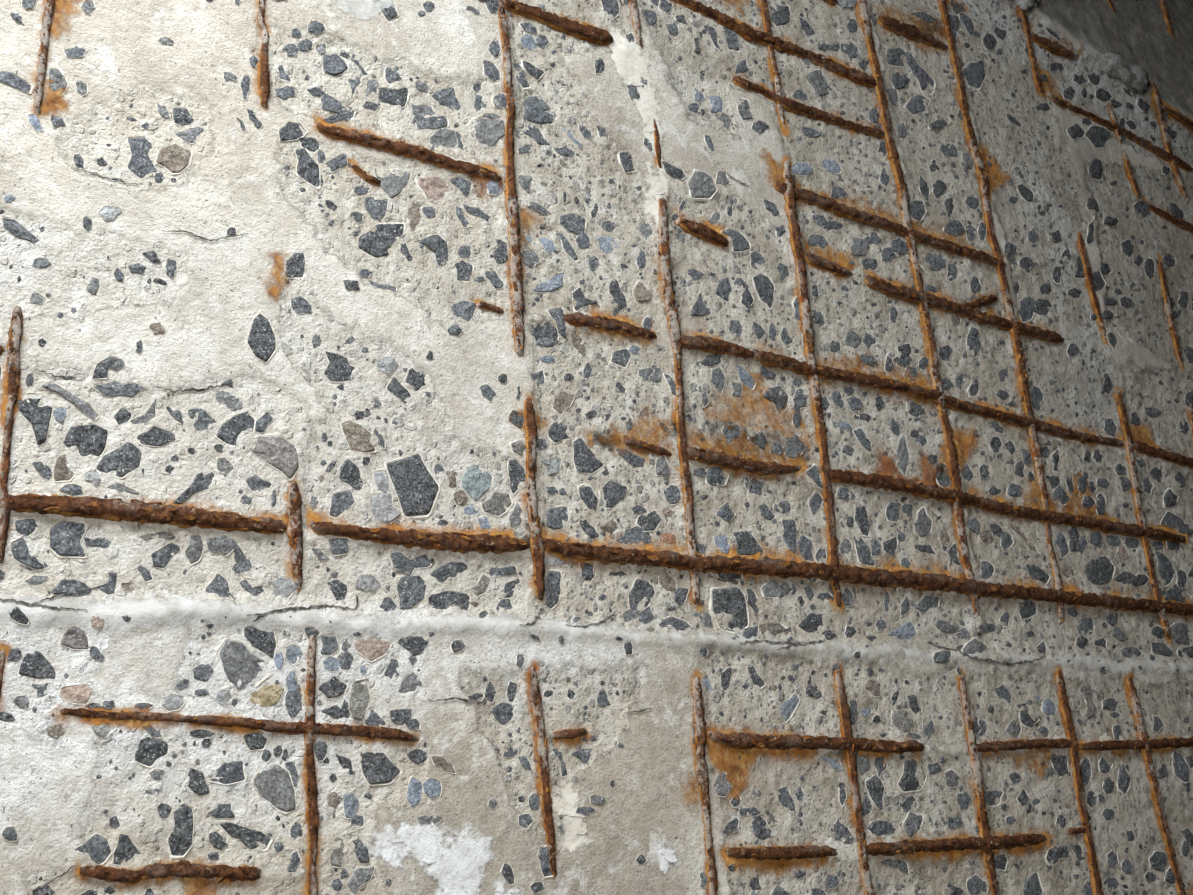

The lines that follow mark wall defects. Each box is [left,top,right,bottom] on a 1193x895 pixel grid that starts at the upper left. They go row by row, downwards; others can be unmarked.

corrosion [33,78,68,116]
spalling [342,280,360,291]
spalling [246,311,277,363]
corrosion [803,242,952,404]
spalling [479,373,508,402]
spalling [1050,440,1193,604]
corrosion [698,547,805,578]
corrosion [80,707,259,734]
spalling [0,606,493,895]
corrosion [692,716,816,800]
spalling [691,641,1193,895]
corrosion [720,844,828,874]